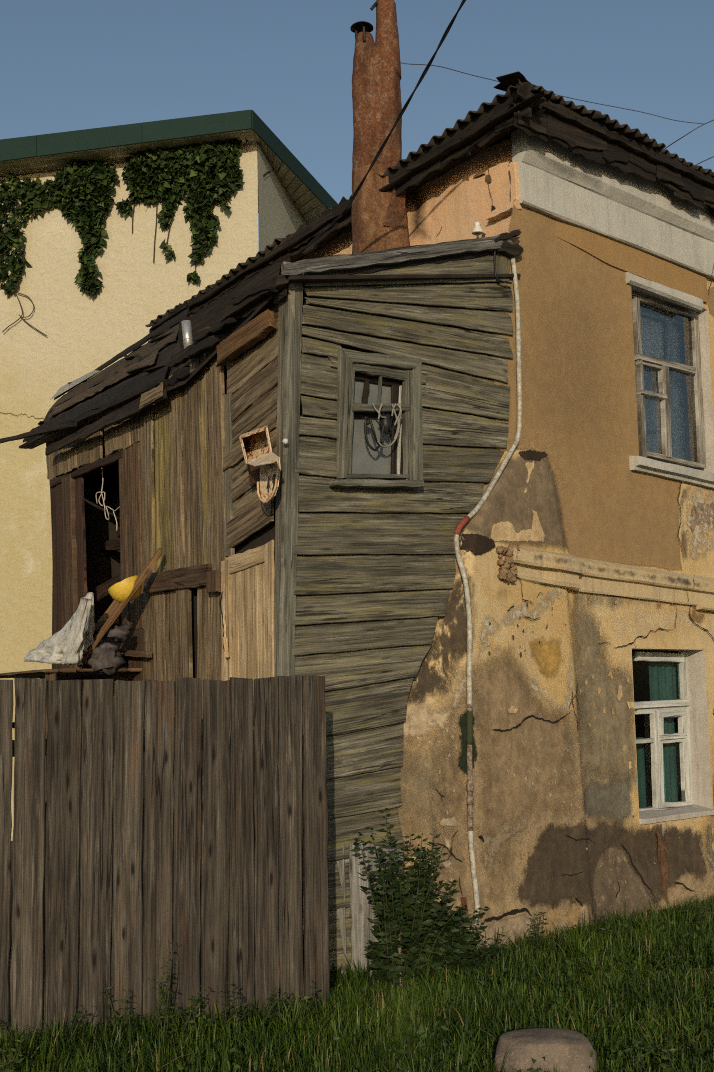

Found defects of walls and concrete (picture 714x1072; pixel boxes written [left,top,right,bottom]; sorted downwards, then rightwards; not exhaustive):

peeling [524,461,535,493]
peeling [446,510,545,573]
crack [599,481,714,649]
peeling [681,487,714,559]
crack [492,661,582,734]
water stain [397,576,714,941]